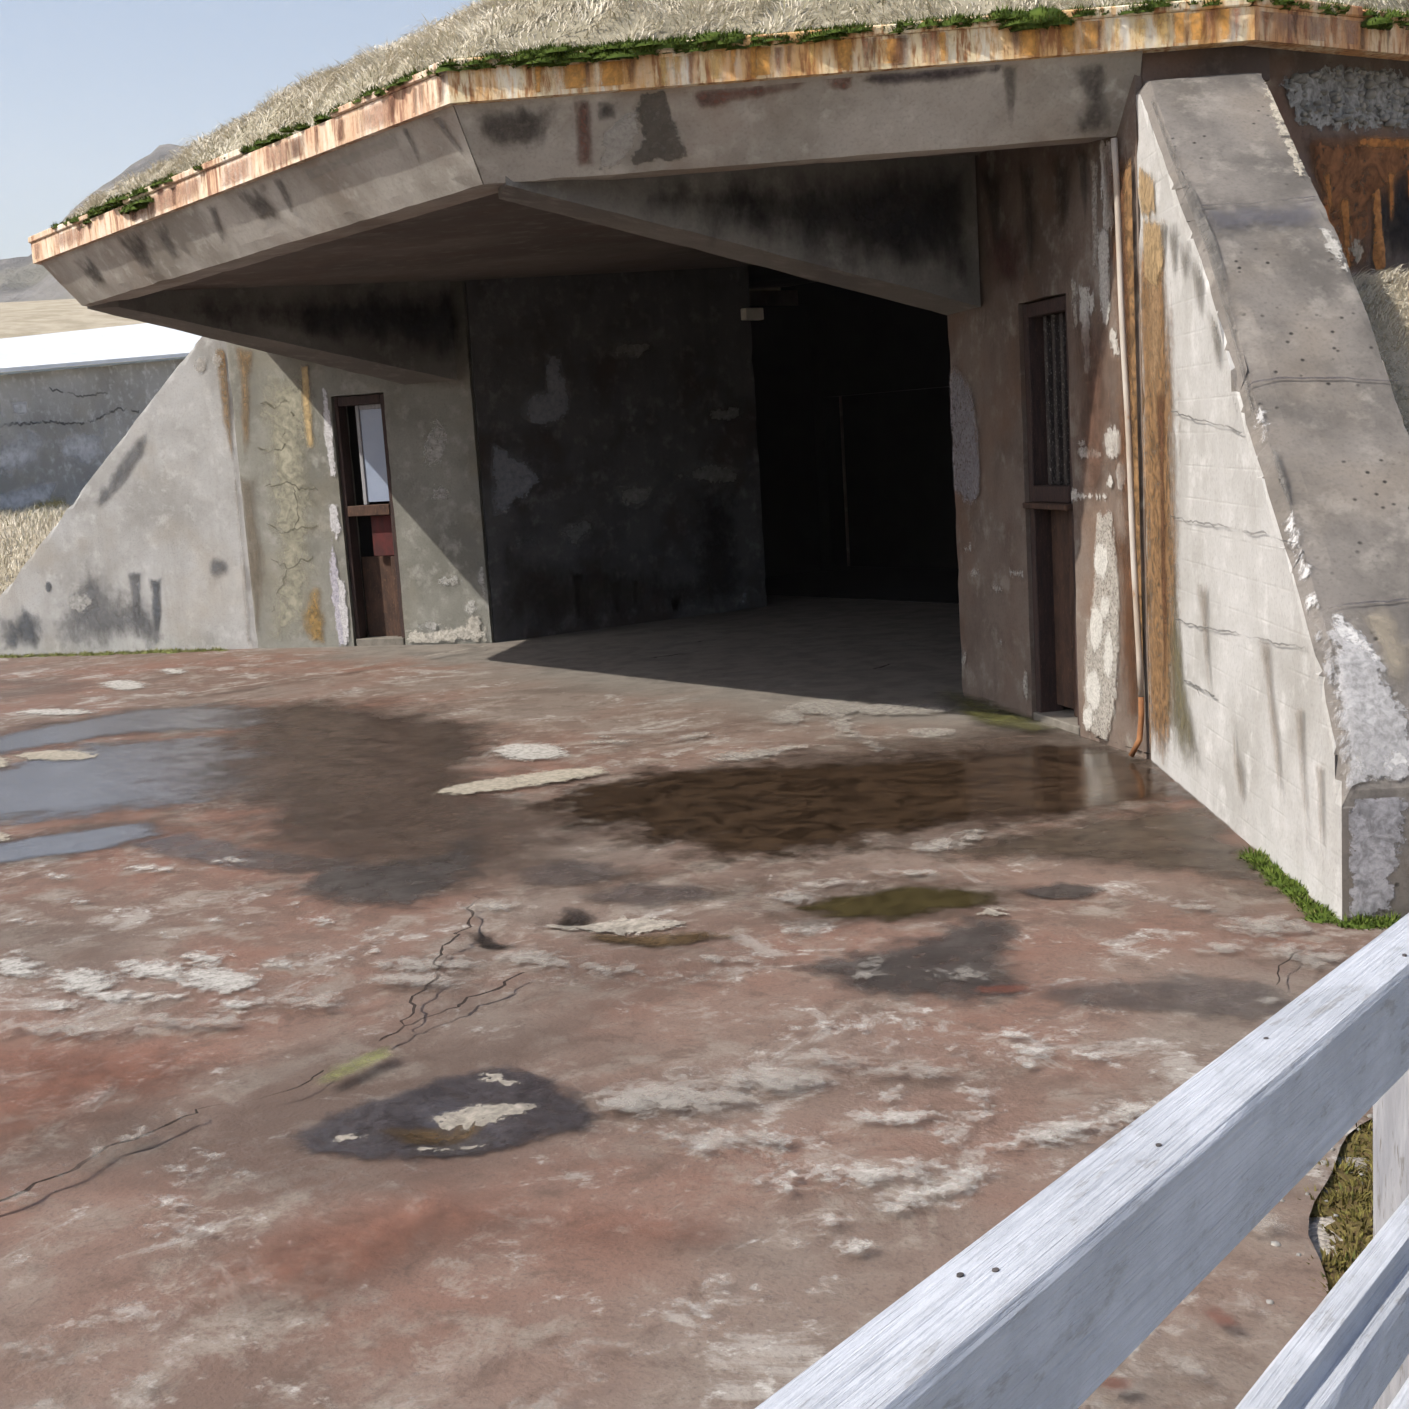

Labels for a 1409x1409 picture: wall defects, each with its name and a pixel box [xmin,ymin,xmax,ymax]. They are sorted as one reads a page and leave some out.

rust [561,59,634,163]
rust [832,32,946,89]
spalling [1265,61,1409,176]
spalling [1322,228,1347,270]
rust [1309,138,1409,269]
crack [11,387,139,427]
rust [1080,154,1176,750]
peeling [1071,424,1151,754]
water stain [0,705,701,904]
spalling [1315,614,1409,917]
crack [379,906,525,1041]
crack [0,1107,205,1202]